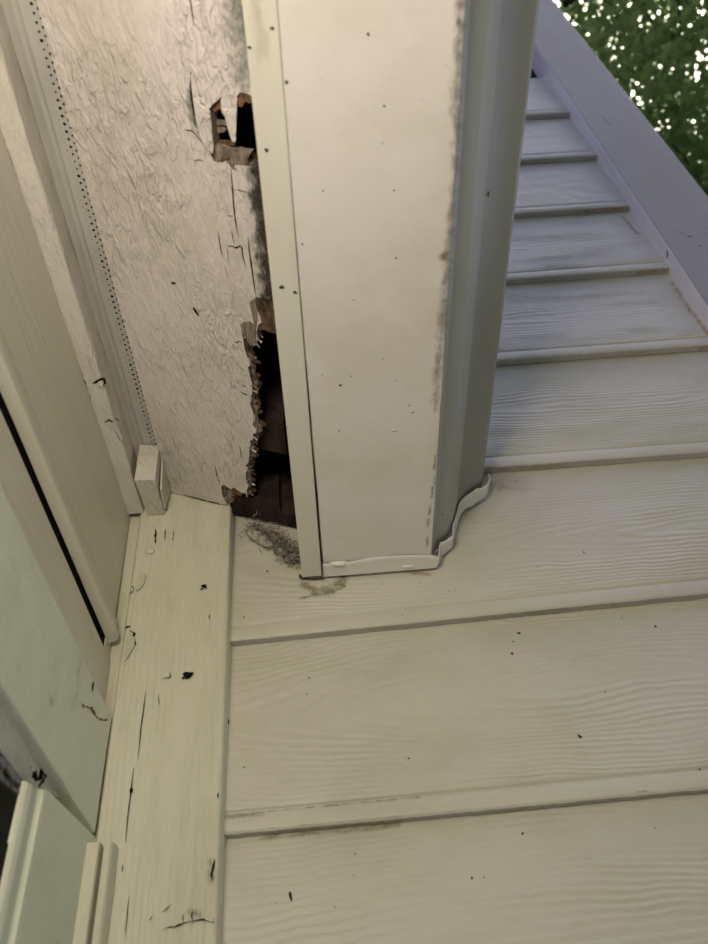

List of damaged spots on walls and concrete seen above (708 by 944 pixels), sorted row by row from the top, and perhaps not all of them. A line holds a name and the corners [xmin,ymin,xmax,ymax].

crack [184,71,204,162]
crack [218,170,256,296]
damp [249,154,273,303]